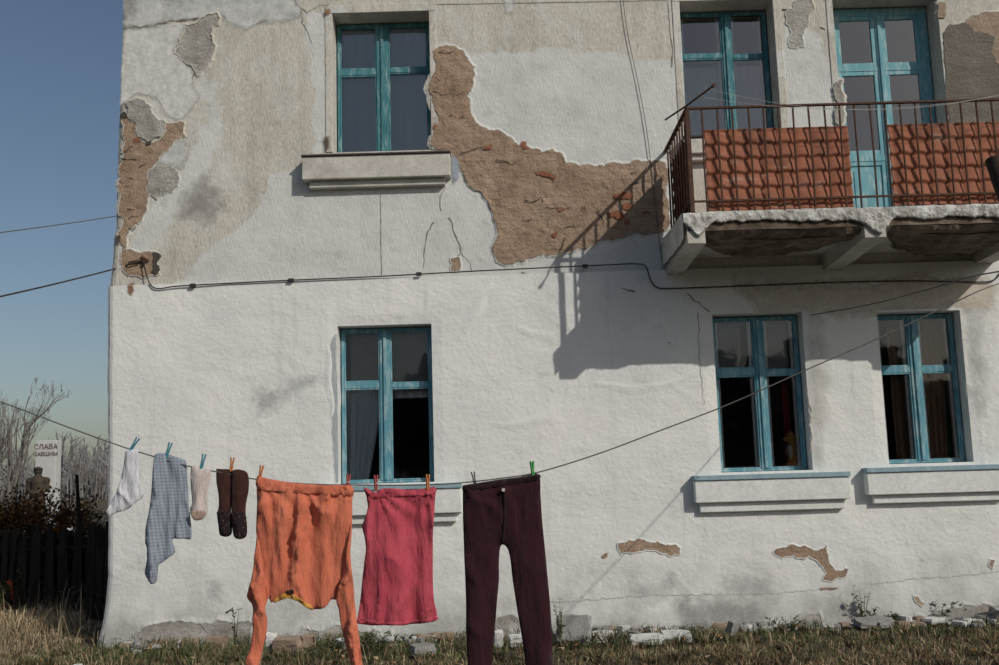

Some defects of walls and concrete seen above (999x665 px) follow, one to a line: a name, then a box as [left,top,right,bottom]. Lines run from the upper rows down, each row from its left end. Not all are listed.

peeling [174,12,223,79]
peeling [784,0,816,50]
peeling [934,2,999,123]
peeling [423,43,673,268]
peeling [115,97,188,280]
peeling [448,256,463,274]
spalling [704,227,861,257]
spalling [886,223,999,257]
peeling [602,537,682,559]
peeling [772,542,850,590]